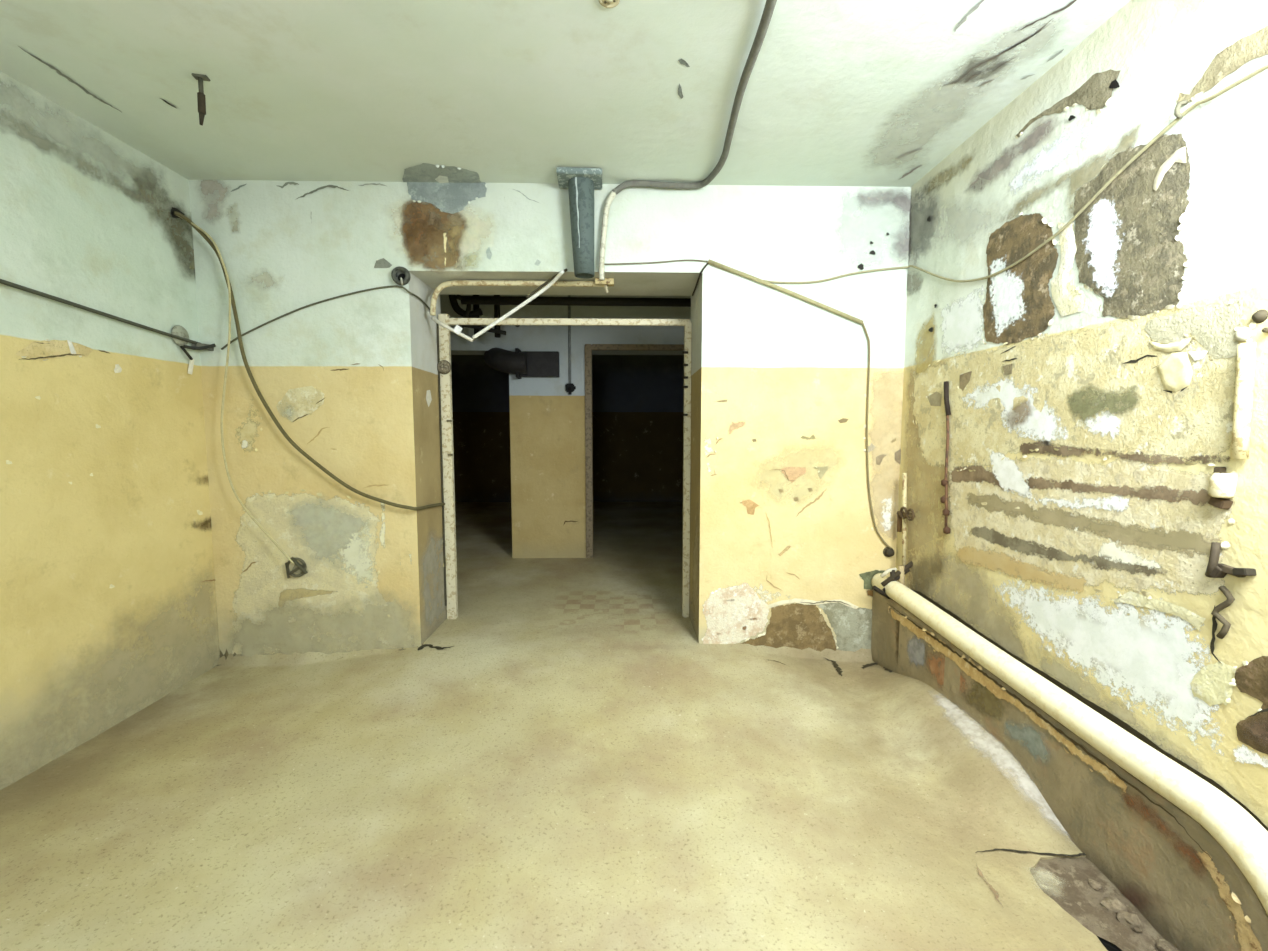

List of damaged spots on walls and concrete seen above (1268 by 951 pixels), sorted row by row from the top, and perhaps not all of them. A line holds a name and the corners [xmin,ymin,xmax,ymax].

leakage [0,87,155,201]
flaking render [402,163,487,214]
leakage [876,26,1050,163]
flaking render [1015,69,1121,139]
flaking render [1176,25,1268,103]
peeling [863,133,1256,630]
peeling [230,489,414,654]
flaking render [742,600,872,652]
flaking render [859,570,884,590]
peeling [888,606,1128,793]
flaking render [1190,656,1268,755]
crack [975,849,1086,905]